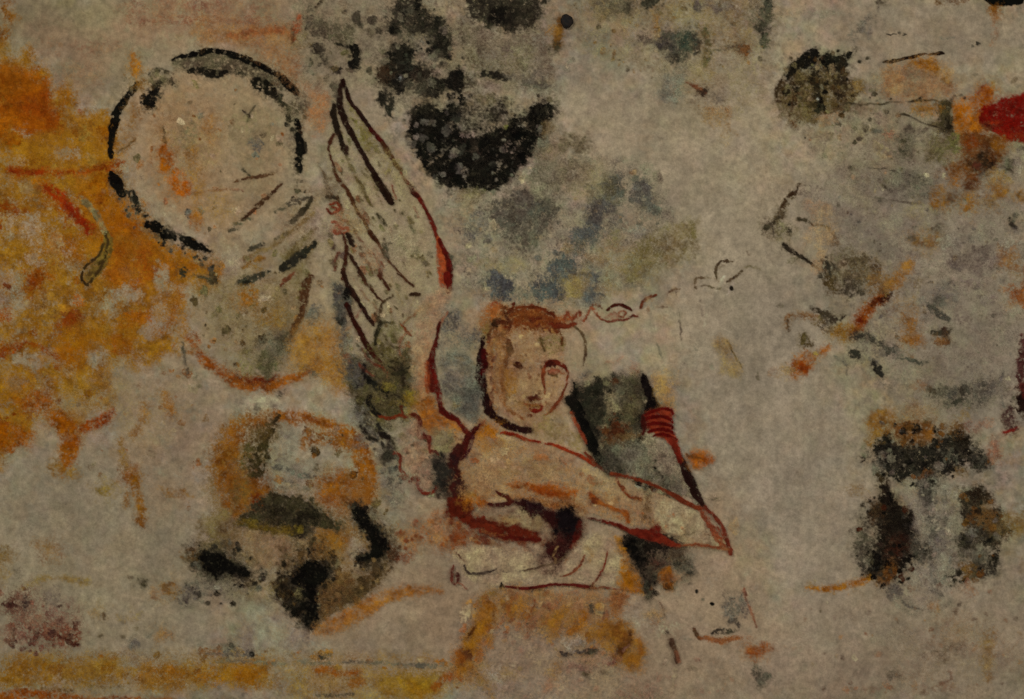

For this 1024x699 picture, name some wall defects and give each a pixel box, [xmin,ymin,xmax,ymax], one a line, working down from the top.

water stain [375,0,592,193]
water stain [774,0,886,127]
water stain [0,2,222,478]
water stain [0,540,487,699]
water stain [150,491,412,631]
water stain [806,331,1024,685]